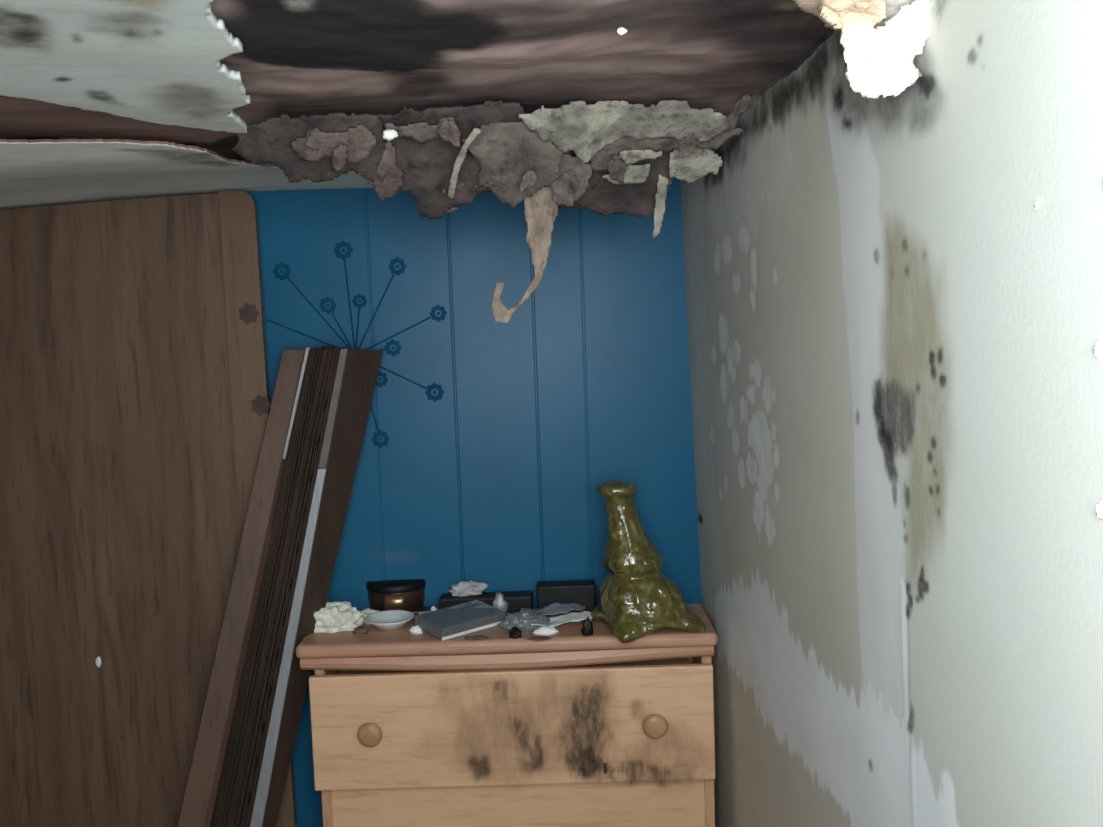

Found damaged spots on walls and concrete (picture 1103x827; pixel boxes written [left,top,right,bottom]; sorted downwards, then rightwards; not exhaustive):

water stain [226,0,847,181]
spalling [193,0,931,323]
water stain [919,76,935,95]
water stain [875,237,945,478]
water stain [907,568,928,617]